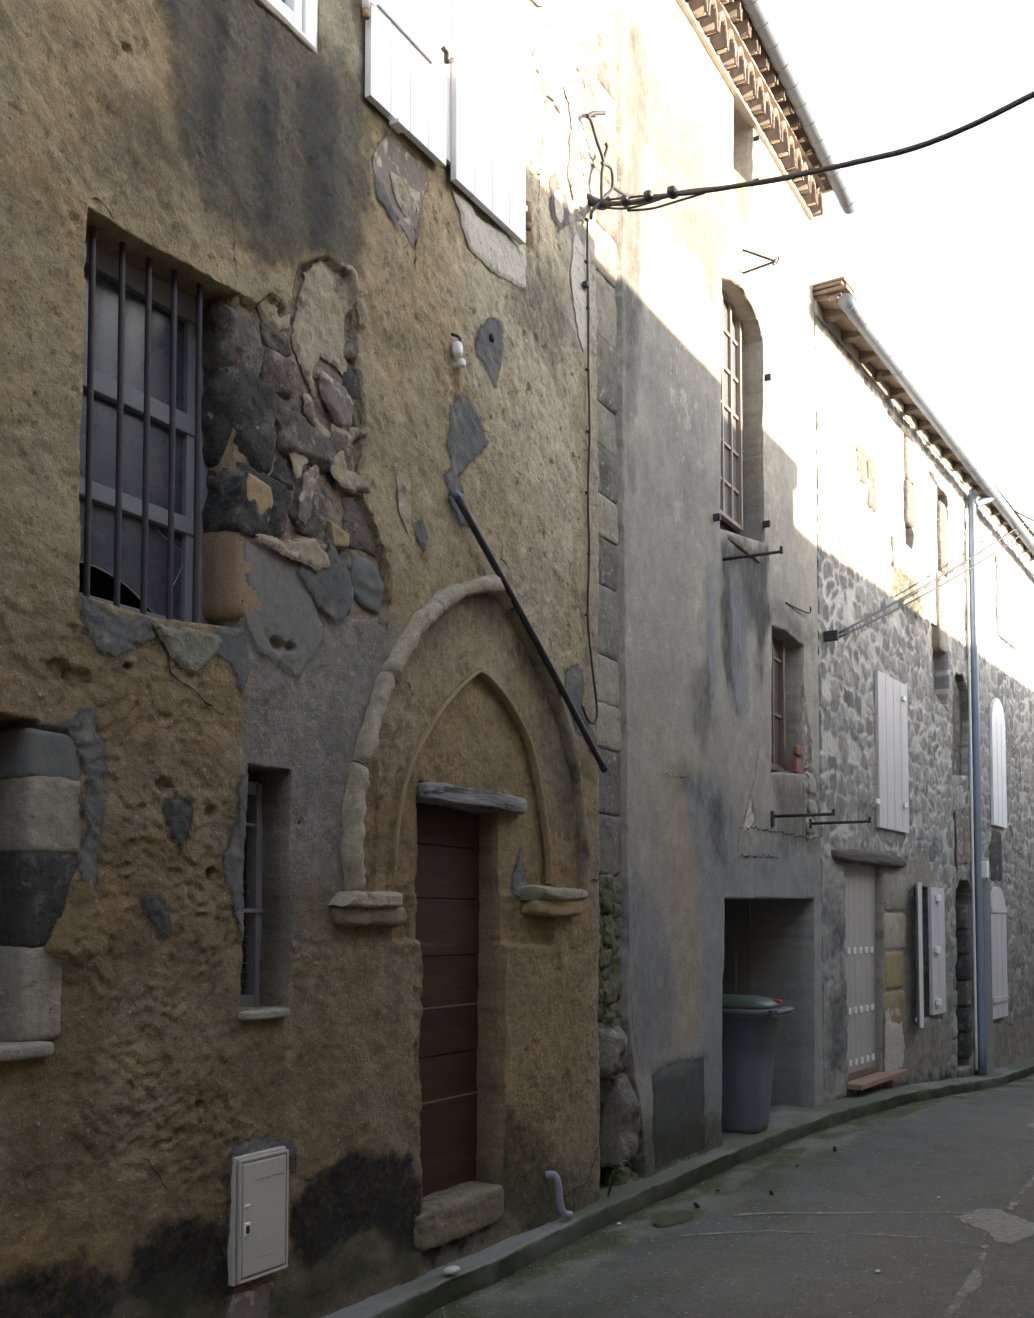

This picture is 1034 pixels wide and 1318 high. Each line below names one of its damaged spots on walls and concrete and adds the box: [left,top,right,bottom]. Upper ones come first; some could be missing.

water stain [161,0,371,269]
spalling [373,135,428,248]
spalling [153,258,391,675]
water stain [708,543,770,710]
water stain [0,1217,234,1318]
water stain [290,1151,490,1269]